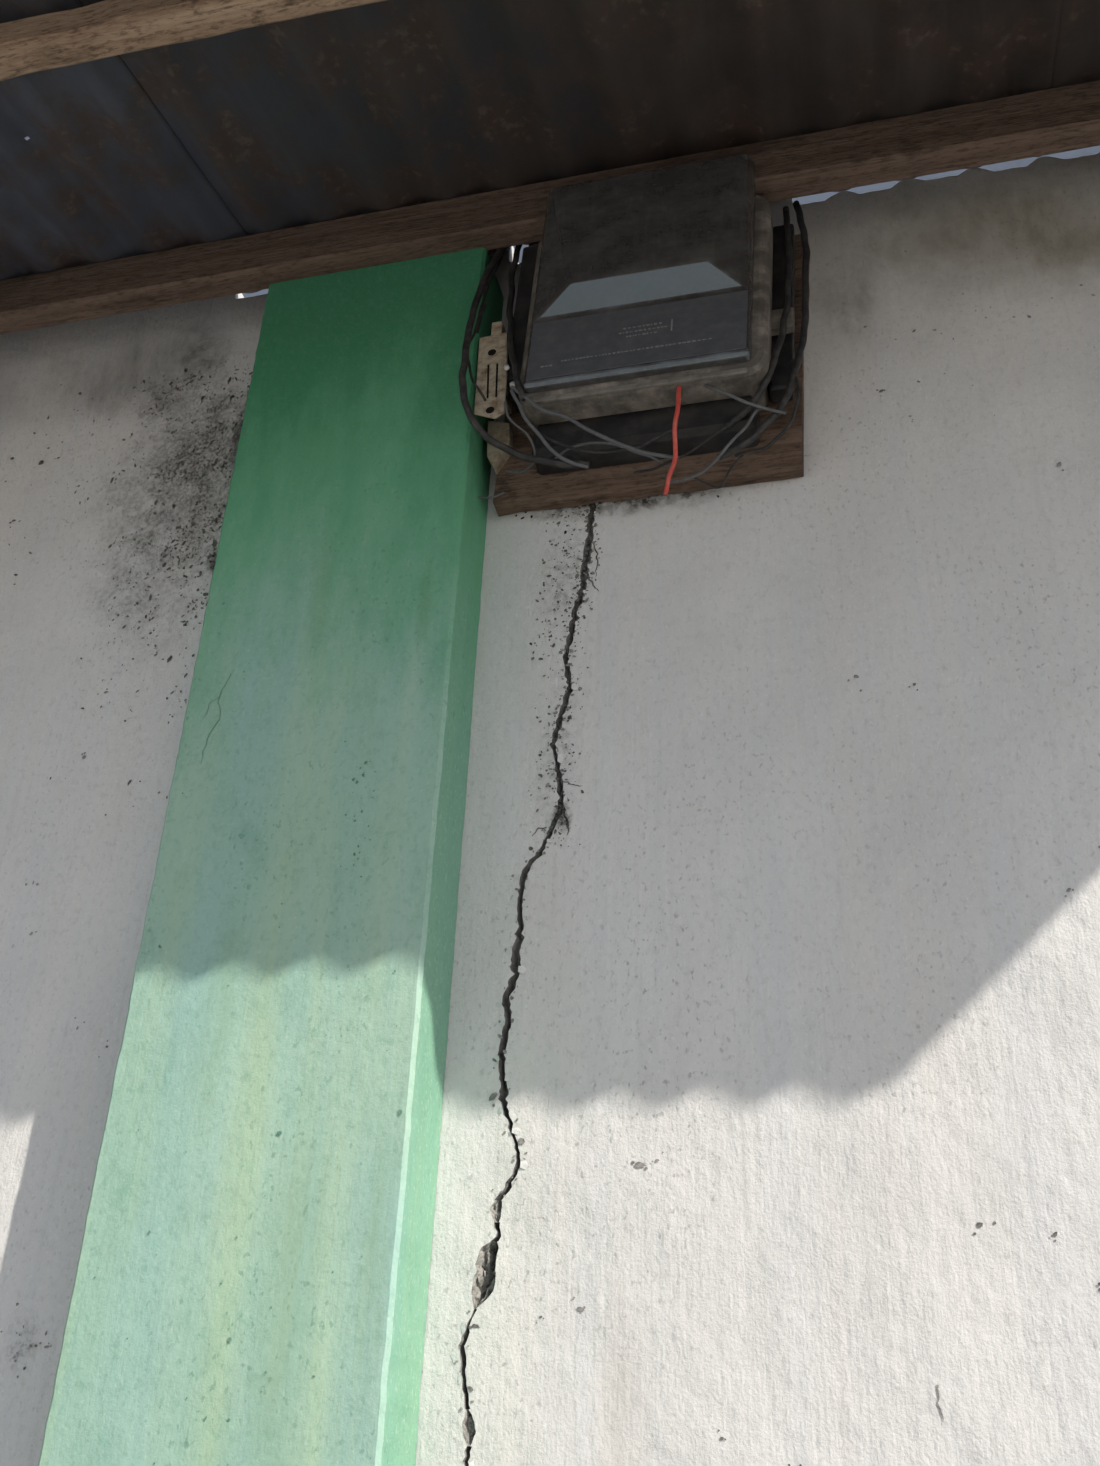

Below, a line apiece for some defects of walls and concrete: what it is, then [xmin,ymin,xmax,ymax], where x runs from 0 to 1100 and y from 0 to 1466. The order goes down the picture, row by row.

water stain [55,356,253,724]
crack [489,503,602,1242]
crack [451,1309,480,1411]
crack [462,1446,474,1466]